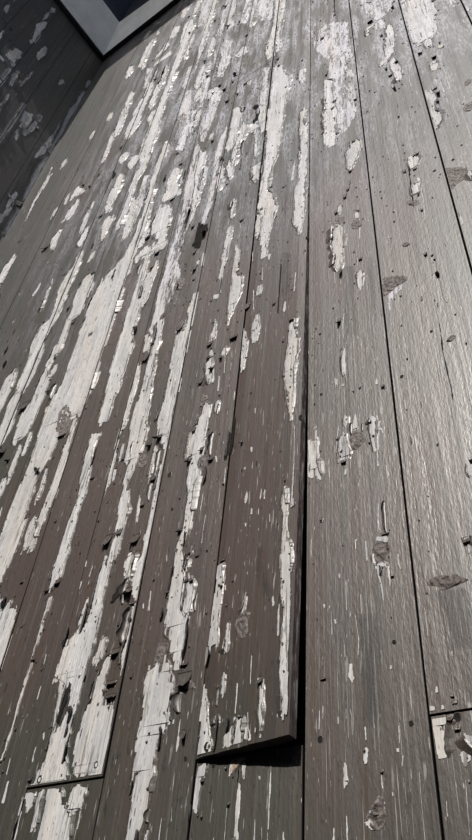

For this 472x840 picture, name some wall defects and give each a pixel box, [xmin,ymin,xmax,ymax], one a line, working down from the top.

peeling [341,0,472,104]
peeling [429,694,472,767]